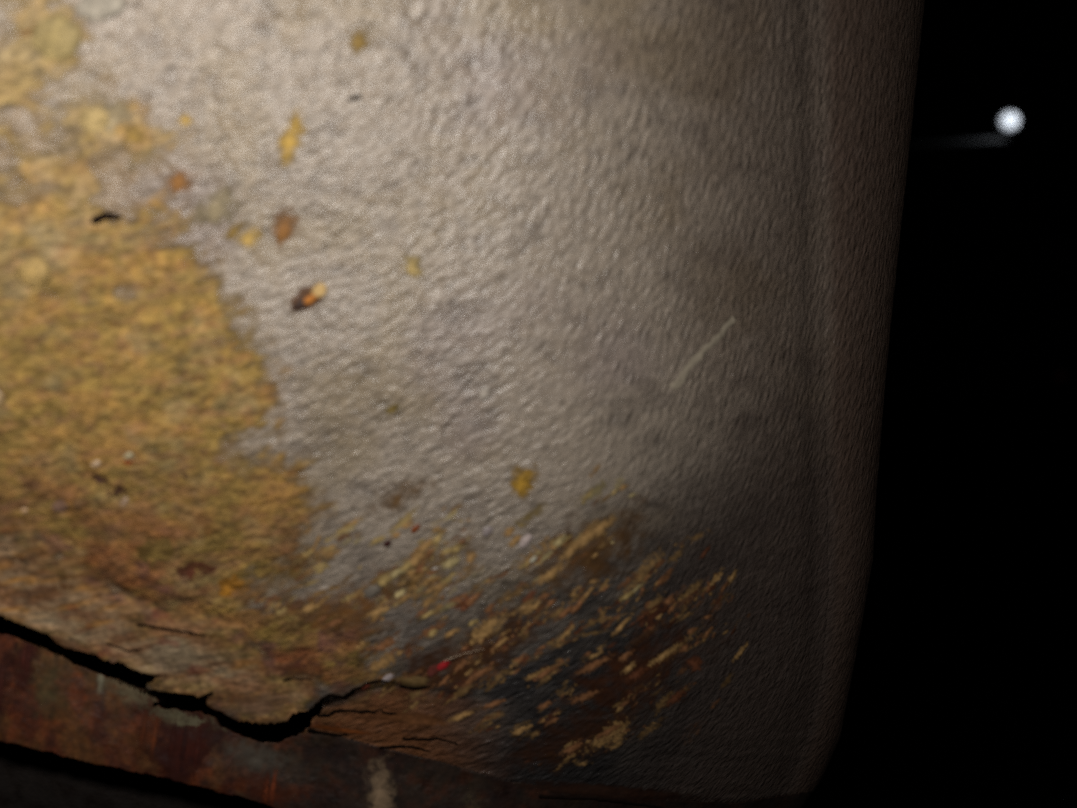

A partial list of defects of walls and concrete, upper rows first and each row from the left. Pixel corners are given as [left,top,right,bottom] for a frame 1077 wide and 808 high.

crack [0,615,457,752]